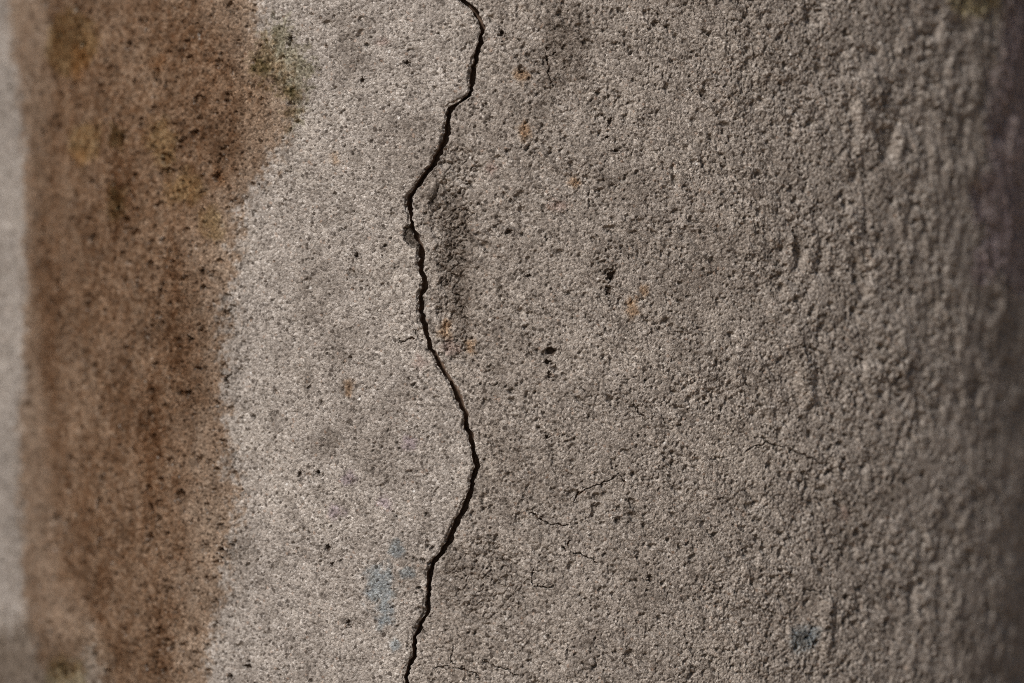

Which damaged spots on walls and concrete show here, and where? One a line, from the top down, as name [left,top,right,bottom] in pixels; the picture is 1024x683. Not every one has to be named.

crack [398,0,521,683]